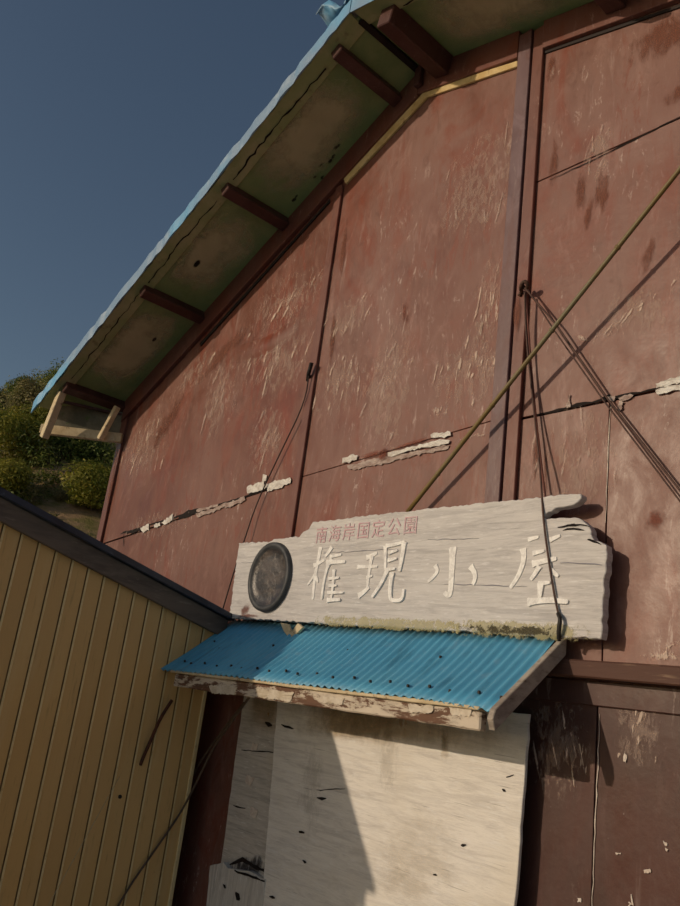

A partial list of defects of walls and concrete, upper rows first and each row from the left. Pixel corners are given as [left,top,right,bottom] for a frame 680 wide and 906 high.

peeling [656,376,680,394]
peeling [342,431,451,470]
peeling [196,474,291,517]
peeling [140,514,173,533]
peeling [209,685,237,695]
peeling [255,688,294,702]
peeling [323,696,344,705]
peeling [408,704,433,714]